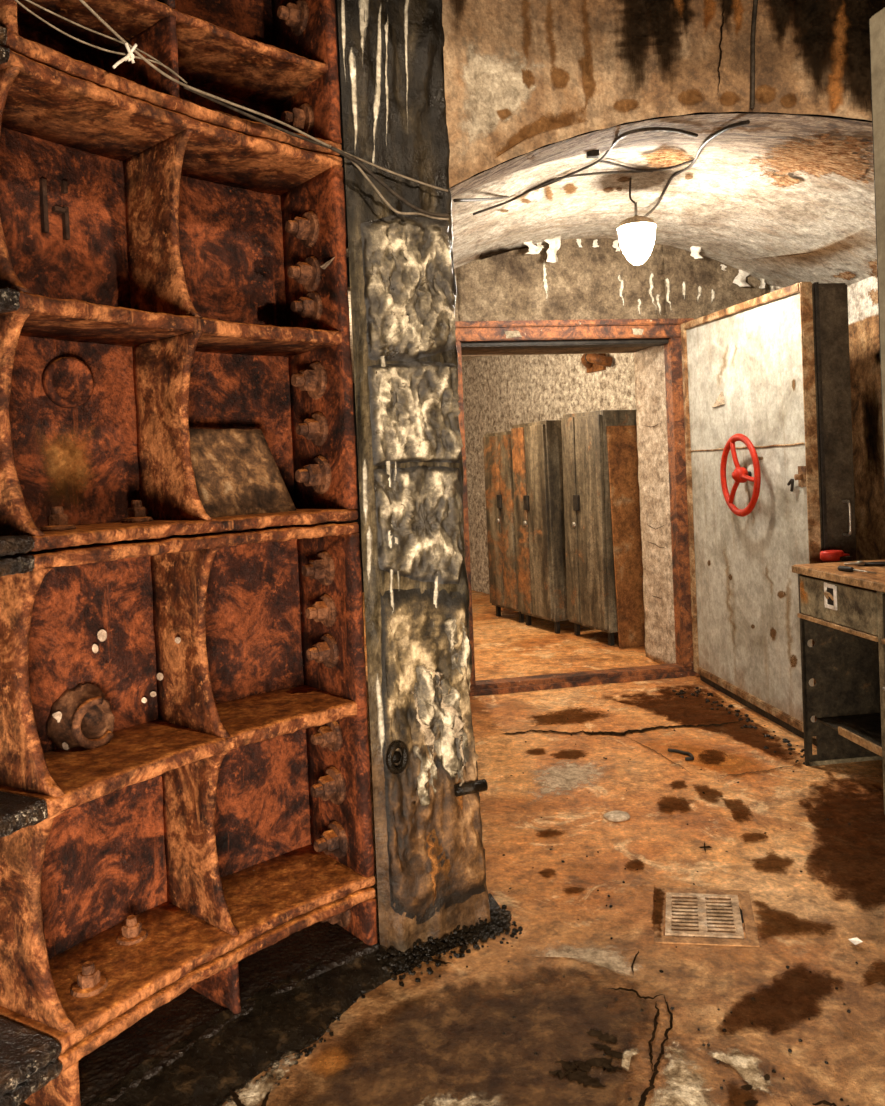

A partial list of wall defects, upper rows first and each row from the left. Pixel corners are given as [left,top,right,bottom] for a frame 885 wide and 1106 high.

water stain [342,0,388,164]
water stain [842,0,885,100]
water stain [534,709,603,725]
crack [503,721,739,774]
water stain [607,686,799,766]
water stain [753,854,793,871]
water stain [800,772,885,908]
water stain [652,889,664,930]
water stain [753,901,831,938]
crack [609,951,673,1106]
water stain [719,966,840,1035]
crack [789,1098,849,1106]